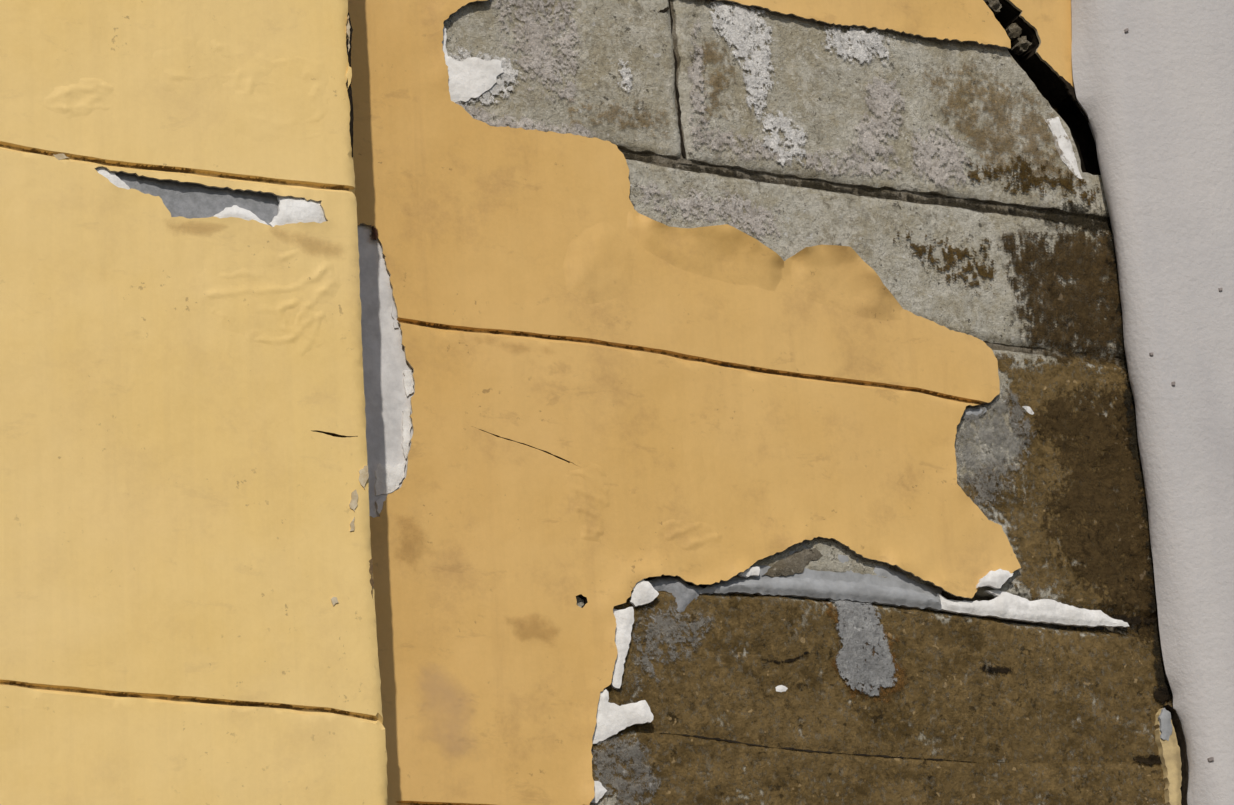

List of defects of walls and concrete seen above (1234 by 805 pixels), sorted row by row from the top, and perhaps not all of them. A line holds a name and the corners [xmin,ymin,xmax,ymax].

peeling [95,167,326,227]
crack [984,0,1101,175]
peeling [349,224,414,531]
crack [479,429,574,464]
peeling [442,0,1173,805]
water stain [591,0,1173,805]